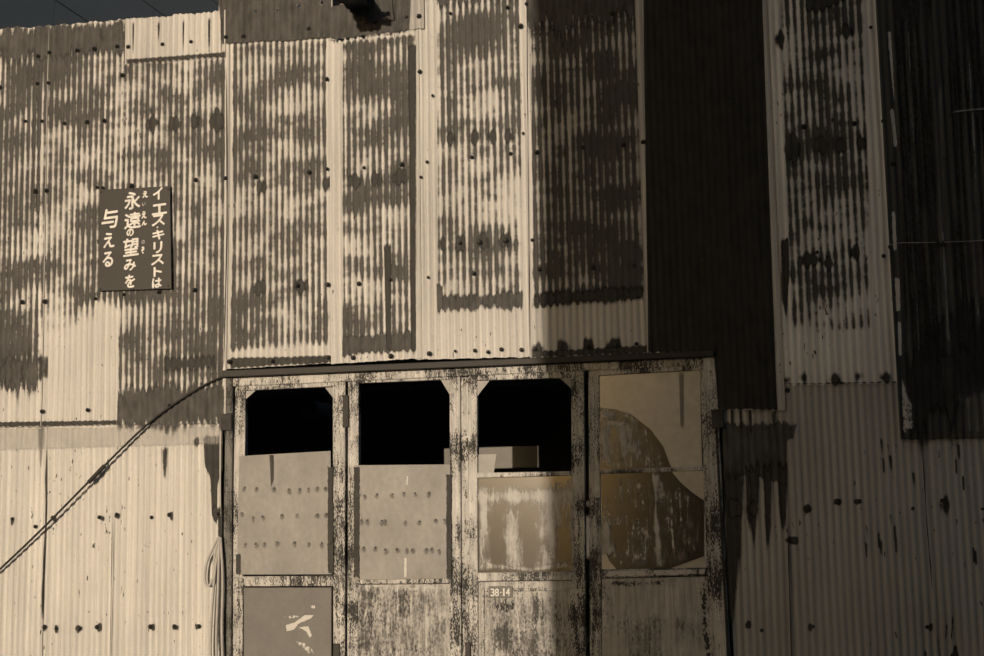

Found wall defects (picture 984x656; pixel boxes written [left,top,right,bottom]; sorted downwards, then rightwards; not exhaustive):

rust [0,0,416,537]
rust [236,542,278,574]
rust [288,466,333,574]
rust [353,467,452,579]
rust [437,0,895,628]
rust [893,0,984,452]